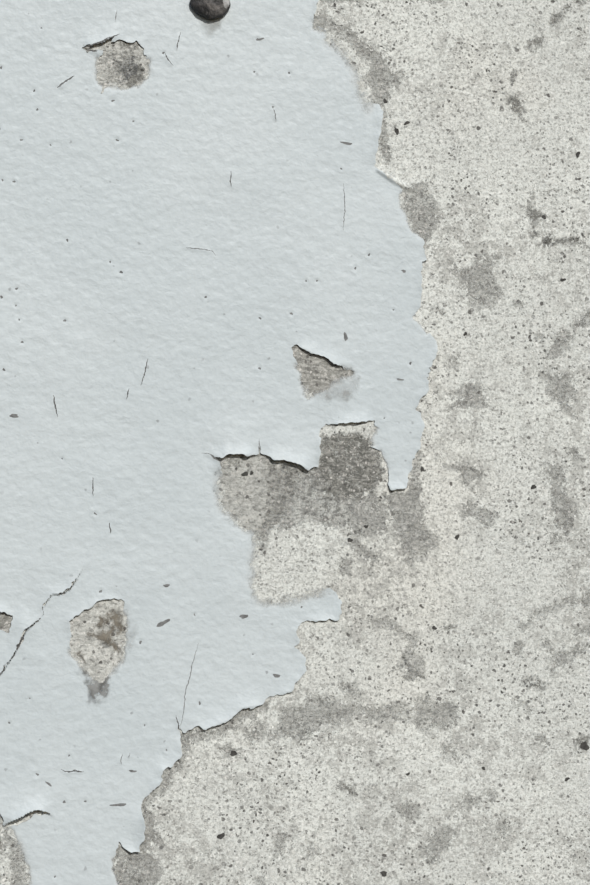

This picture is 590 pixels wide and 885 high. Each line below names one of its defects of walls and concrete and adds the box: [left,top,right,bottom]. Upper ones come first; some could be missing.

peeling [83,27,150,92]
spalling [312,0,403,165]
spalling [506,95,525,122]
spalling [402,182,439,247]
spalling [450,255,507,308]
peeling [292,336,355,395]
spalling [535,310,590,359]
peeling [211,407,439,577]
crack [0,570,82,675]
peeling [63,590,128,686]
peeling [113,682,457,885]
peeling [0,789,66,885]